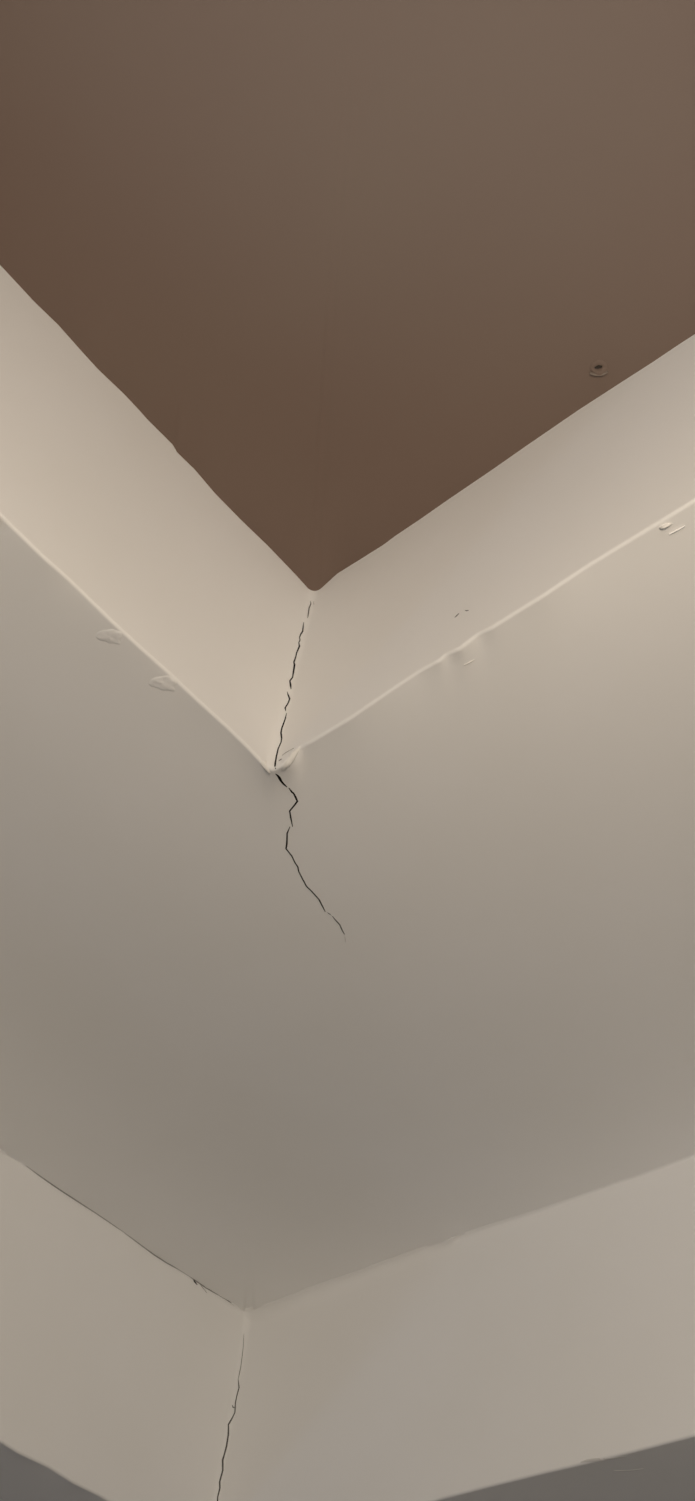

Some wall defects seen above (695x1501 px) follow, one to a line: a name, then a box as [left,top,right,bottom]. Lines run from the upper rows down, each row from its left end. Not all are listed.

crack [274,601,346,942]
crack [28,1167,244,1501]